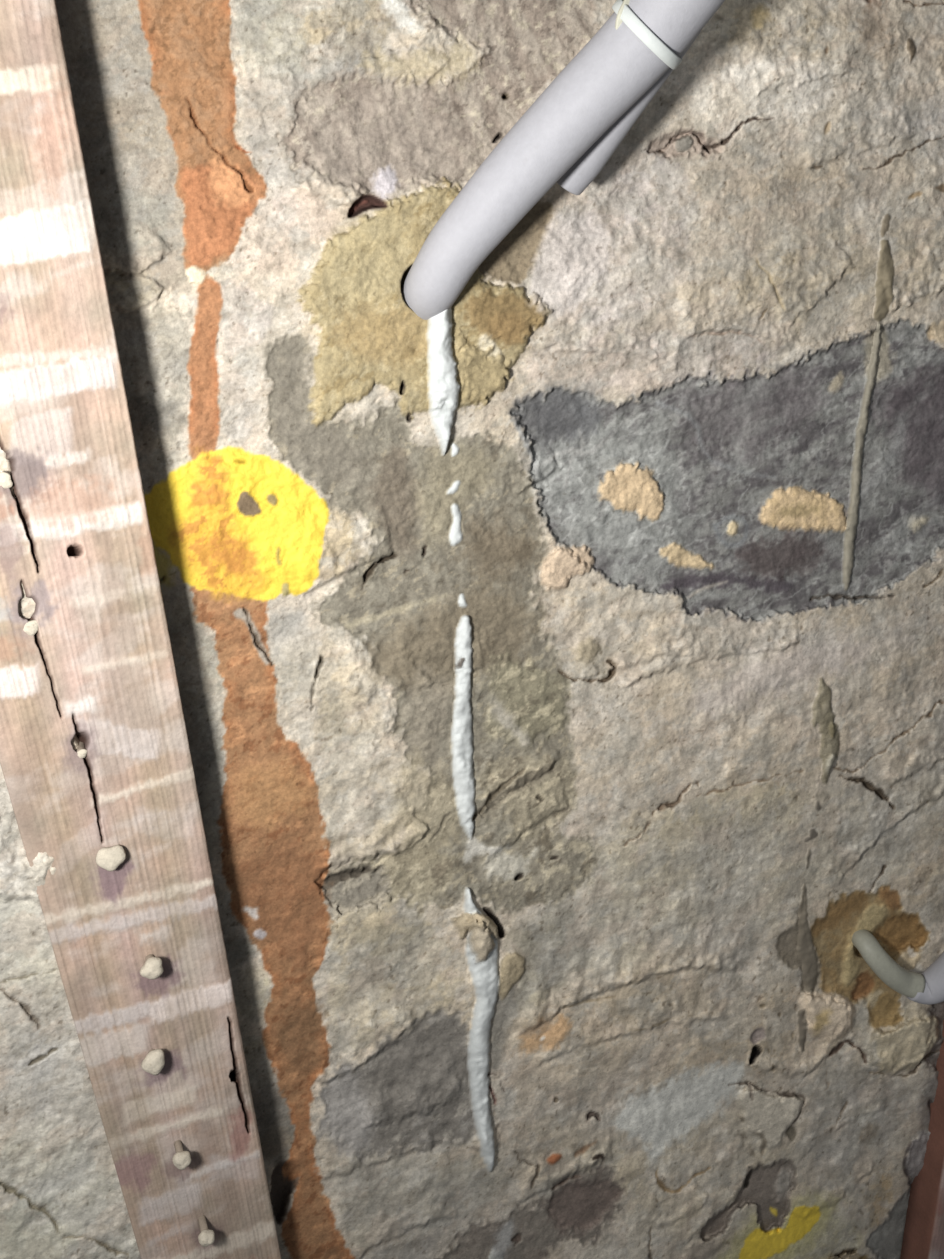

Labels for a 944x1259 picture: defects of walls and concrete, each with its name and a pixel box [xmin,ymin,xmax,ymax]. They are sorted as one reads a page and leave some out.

crack [642,116,776,167]
crack [861,134,944,172]
rust [348,198,370,216]
rust [134,0,357,1259]
crack [623,699,944,847]
crack [0,968,61,1069]
crack [0,1174,131,1259]